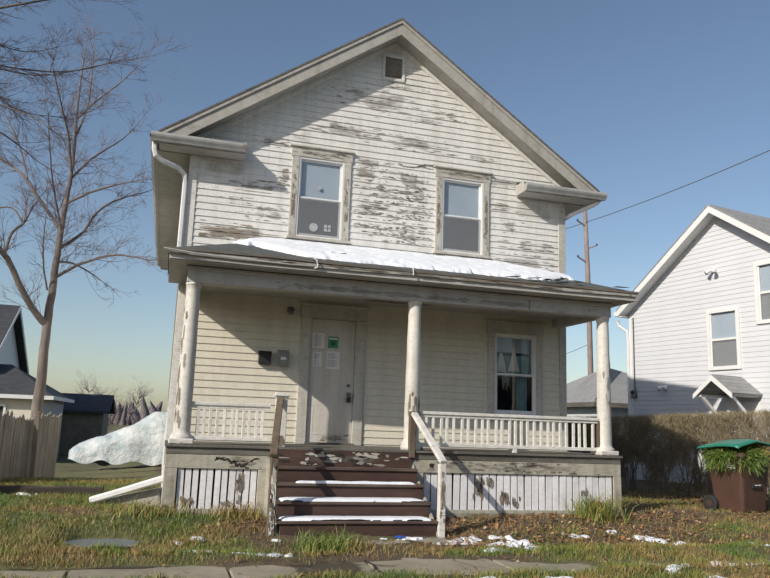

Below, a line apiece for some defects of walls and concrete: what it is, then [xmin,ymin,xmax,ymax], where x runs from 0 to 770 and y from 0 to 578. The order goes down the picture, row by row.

peeling [310,82,466,125]
peeling [298,118,460,156]
peeling [198,166,298,241]
peeling [256,138,495,256]
peeling [483,196,554,272]
crack [214,457,259,469]
peeling [217,457,262,506]
peeling [268,435,290,536]
peeling [300,451,408,467]
peeling [428,461,582,523]